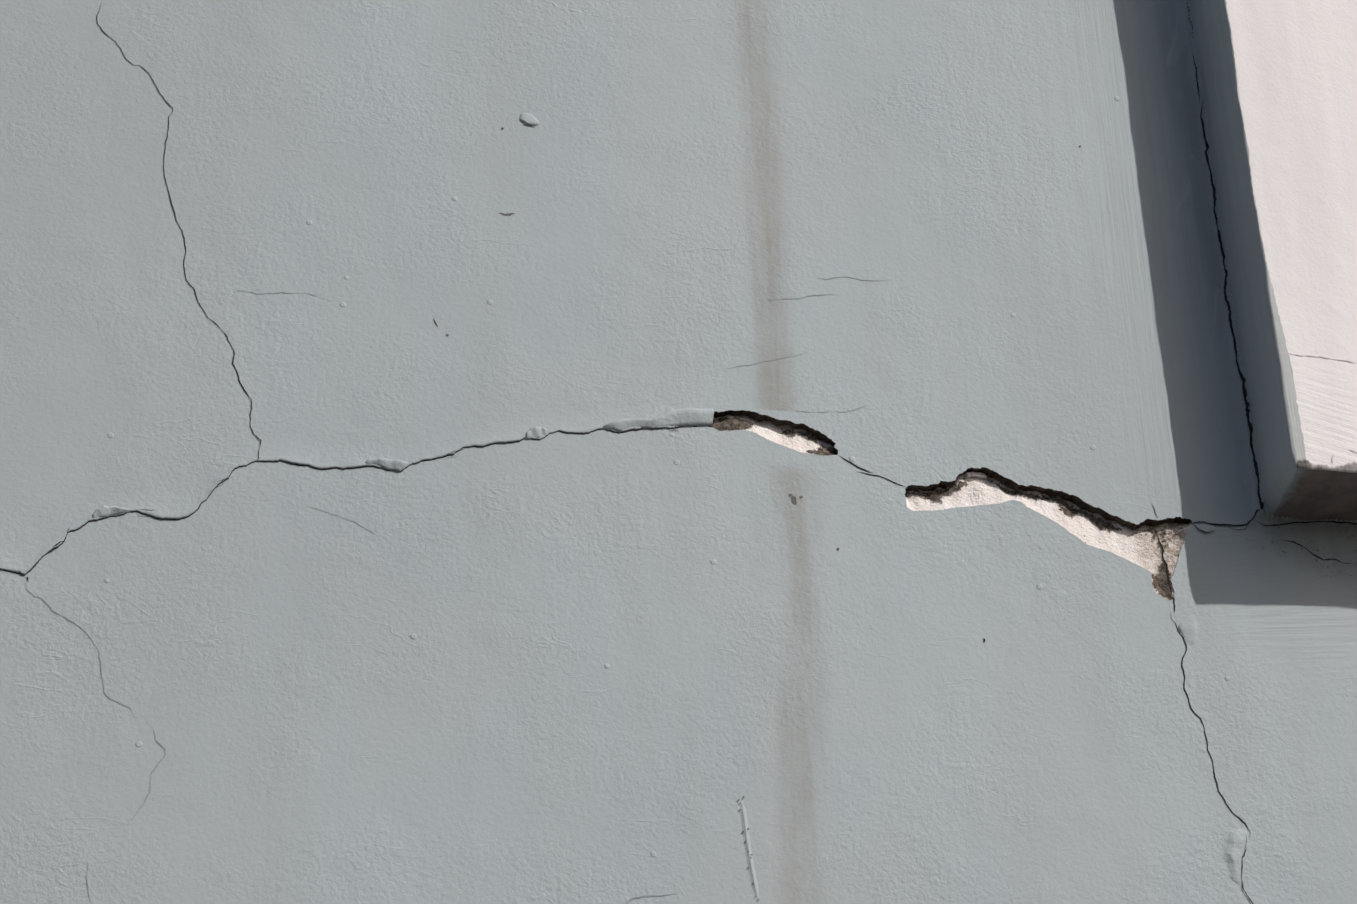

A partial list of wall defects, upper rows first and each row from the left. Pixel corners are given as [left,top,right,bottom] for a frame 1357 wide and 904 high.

crack [755,276,881,300]
crack [1187,2,1357,564]
crack [0,5,712,821]
spalling [712,410,839,456]
crack [838,451,906,487]
spalling [905,467,1192,600]
crack [1171,598,1253,904]
crack [625,893,677,904]